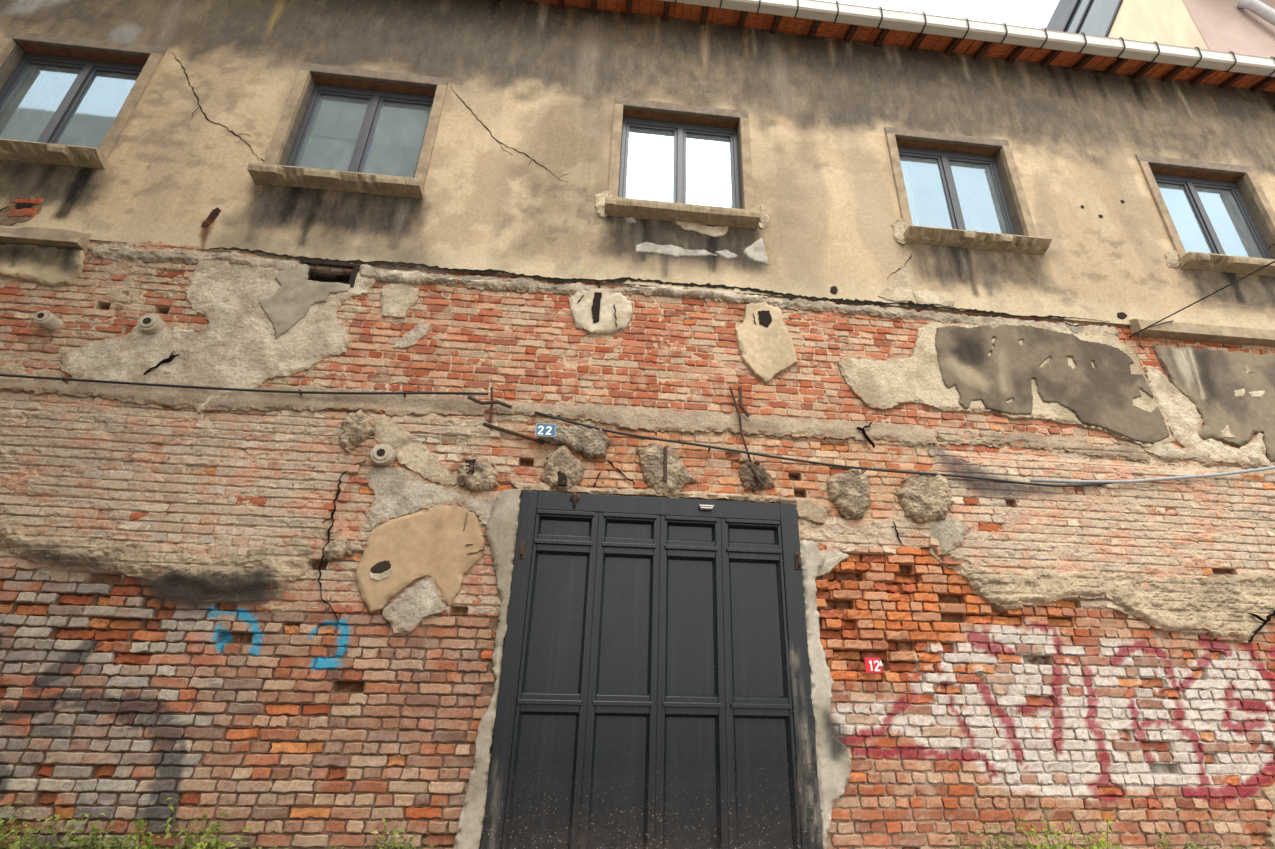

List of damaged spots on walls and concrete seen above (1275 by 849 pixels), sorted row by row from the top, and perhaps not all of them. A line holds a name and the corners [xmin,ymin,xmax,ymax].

crack [172,53,264,161]
crack [450,86,568,182]
leakage [0,0,1275,173]
spalling [0,196,47,226]
flaking render [0,244,85,288]
peeling [636,206,770,265]
flaking render [60,256,433,414]
flaking render [836,266,1275,467]
flaking render [0,523,337,600]
flaking render [355,414,498,635]
flaking render [815,548,849,580]
flaking render [927,515,1275,644]